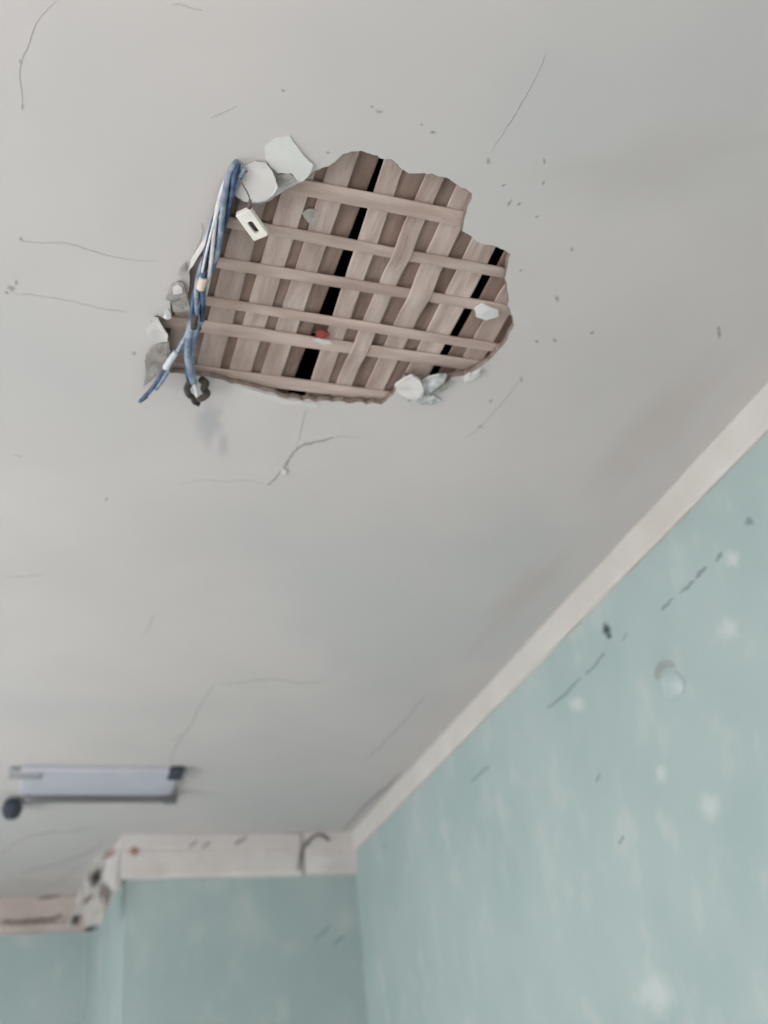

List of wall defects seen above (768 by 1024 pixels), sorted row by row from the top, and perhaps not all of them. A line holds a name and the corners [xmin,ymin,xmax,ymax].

crack [18,0,58,112]
crack [490,53,547,150]
spalling [228,136,313,202]
spalling [456,184,472,231]
spalling [130,224,523,408]
crack [175,410,363,486]
peeling [71,871,114,933]